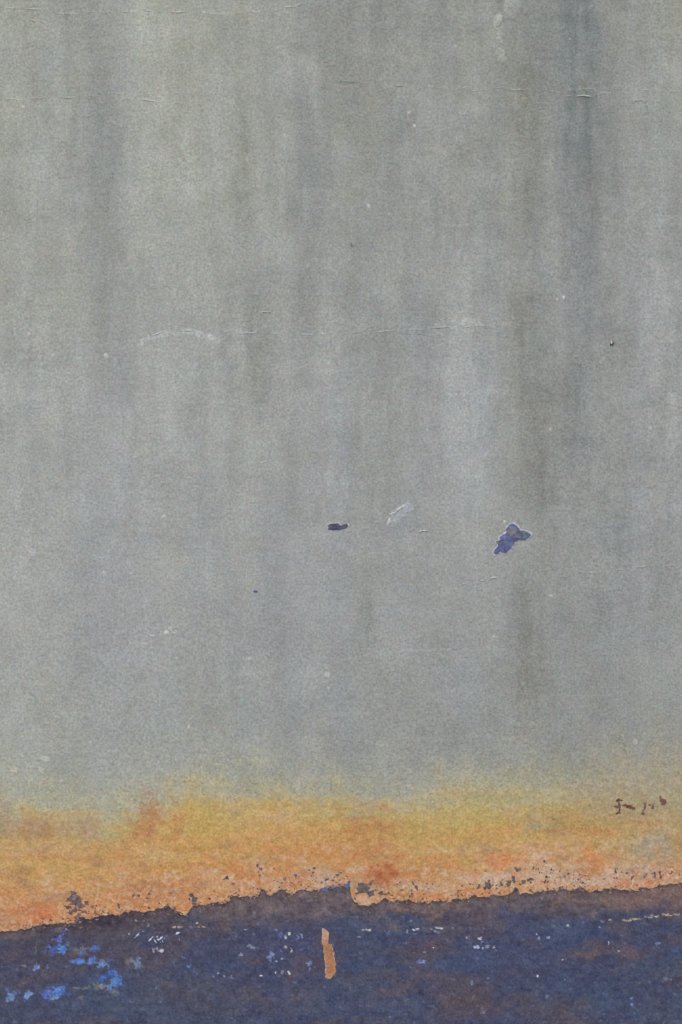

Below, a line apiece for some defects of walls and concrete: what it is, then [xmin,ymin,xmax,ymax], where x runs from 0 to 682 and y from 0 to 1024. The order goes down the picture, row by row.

peeling [492,520,533,556]
rust [0,766,682,931]